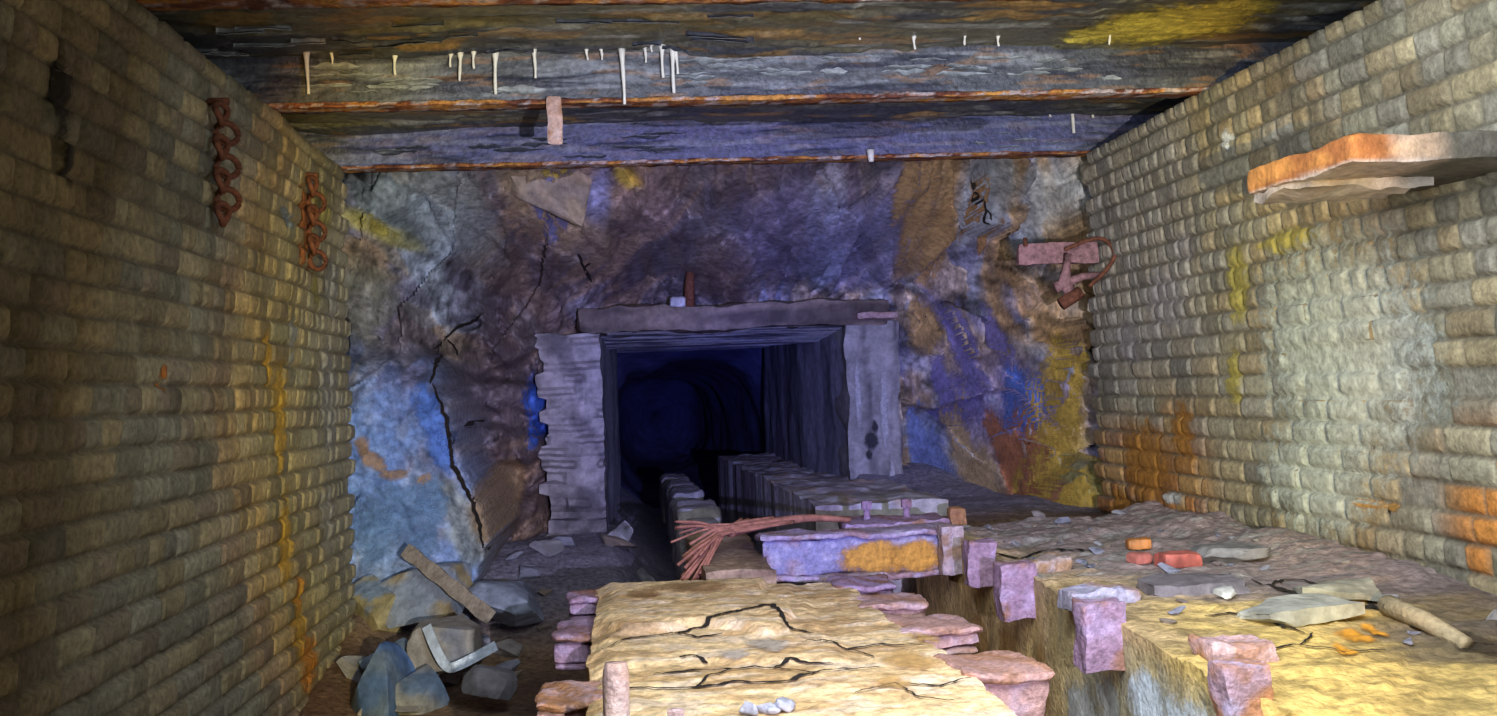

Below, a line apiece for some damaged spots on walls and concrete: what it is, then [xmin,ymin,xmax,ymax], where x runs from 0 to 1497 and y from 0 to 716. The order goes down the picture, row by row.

crack [429,313,491,550]
crack [602,603,971,700]